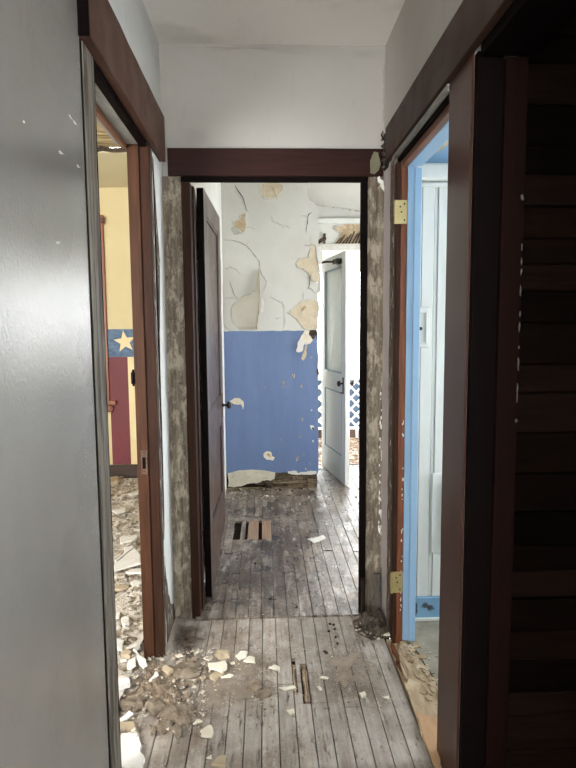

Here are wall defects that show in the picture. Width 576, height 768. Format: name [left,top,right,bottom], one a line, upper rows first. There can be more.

crack [234,185,250,213]
spalling [258,183,285,200]
spalling [231,212,248,235]
crack [271,212,313,246]
crack [224,239,286,329]
spalling [244,224,360,361]
crack [303,275,316,300]
spalling [226,470,317,489]